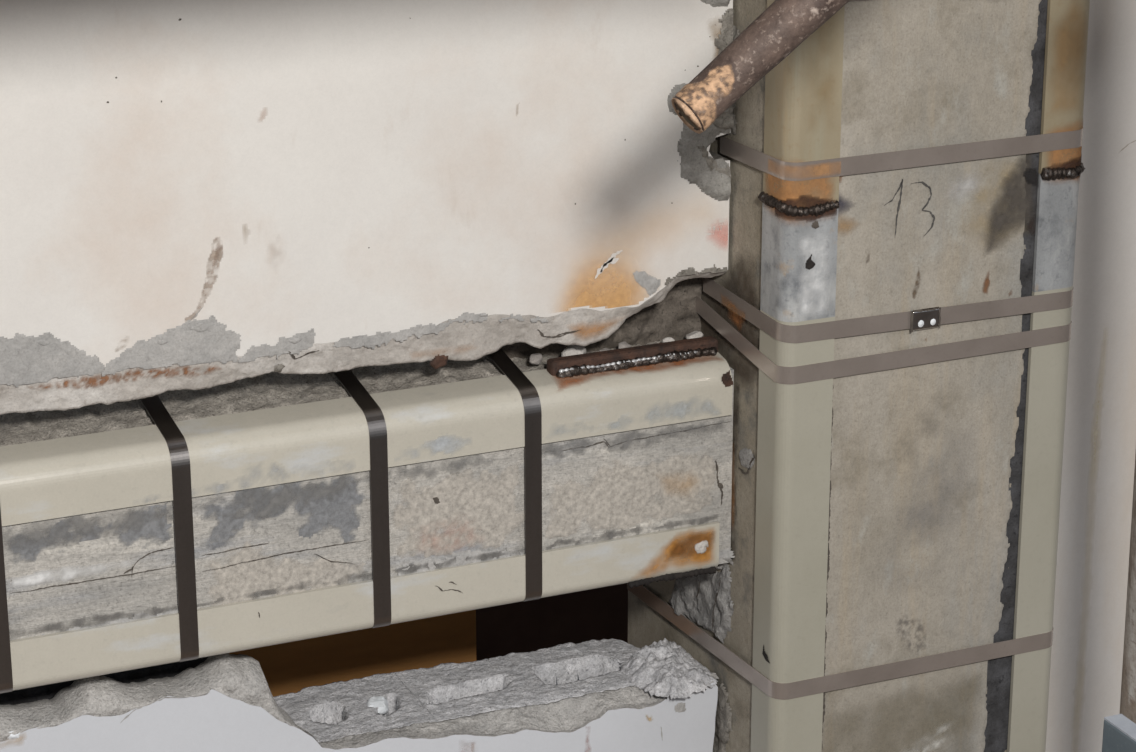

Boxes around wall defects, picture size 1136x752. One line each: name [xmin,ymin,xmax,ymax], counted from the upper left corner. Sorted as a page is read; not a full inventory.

spalling [701,0,734,57]
rust [1047,146,1082,179]
rust [768,164,837,220]
rust [595,250,623,279]
rust [579,292,627,308]
flaking render [0,264,728,415]
rust [558,377,583,387]
rust [601,359,698,374]
crack [10,547,175,594]
crack [202,540,364,572]
rust [651,532,712,570]
spalling [0,653,661,747]